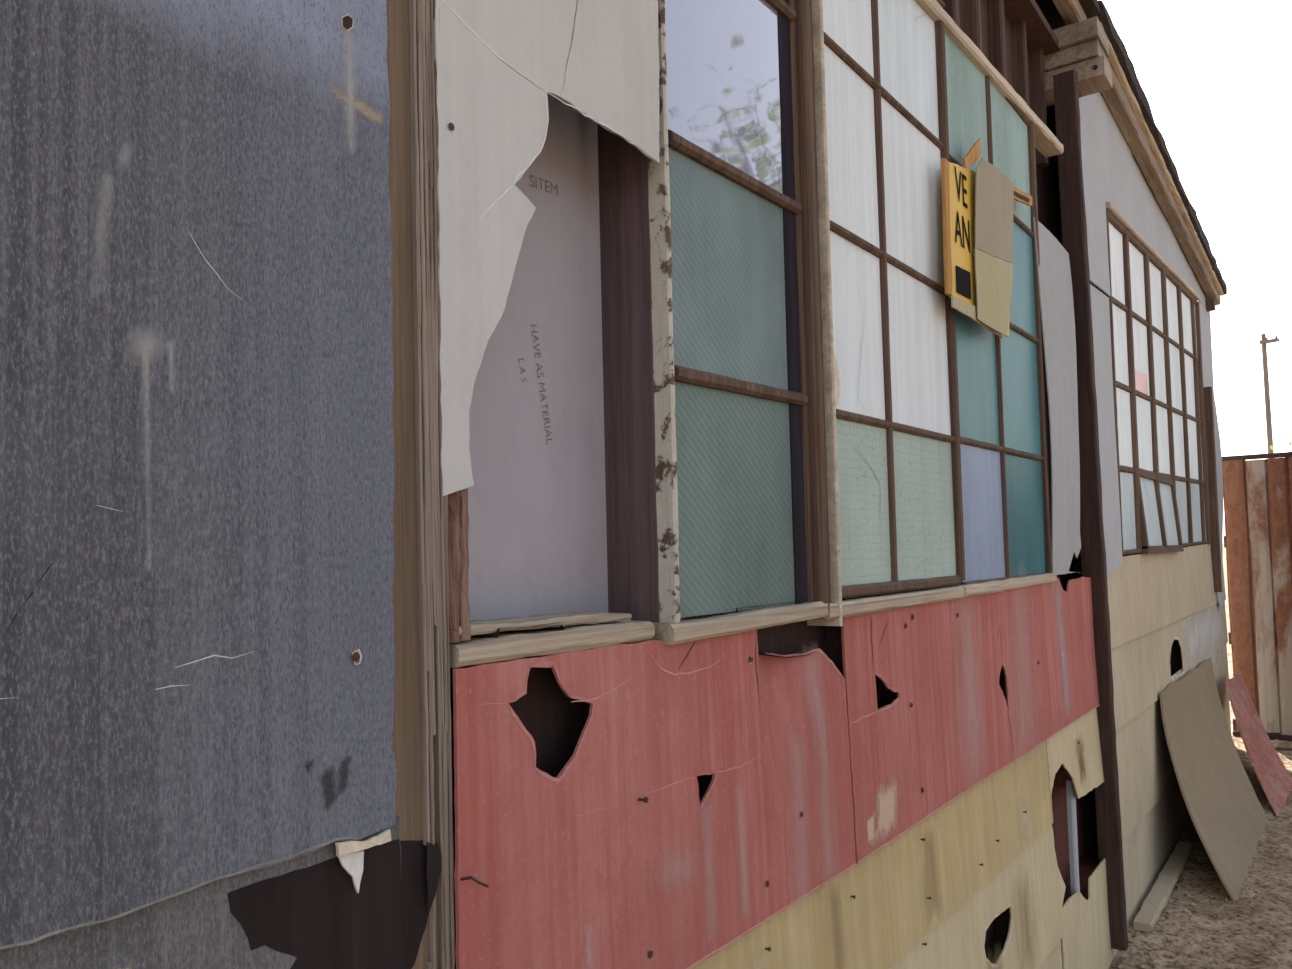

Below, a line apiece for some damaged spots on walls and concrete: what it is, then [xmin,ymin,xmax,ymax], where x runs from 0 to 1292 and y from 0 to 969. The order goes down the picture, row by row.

spalling [513,91,658,208]
spalling [335,829,391,893]